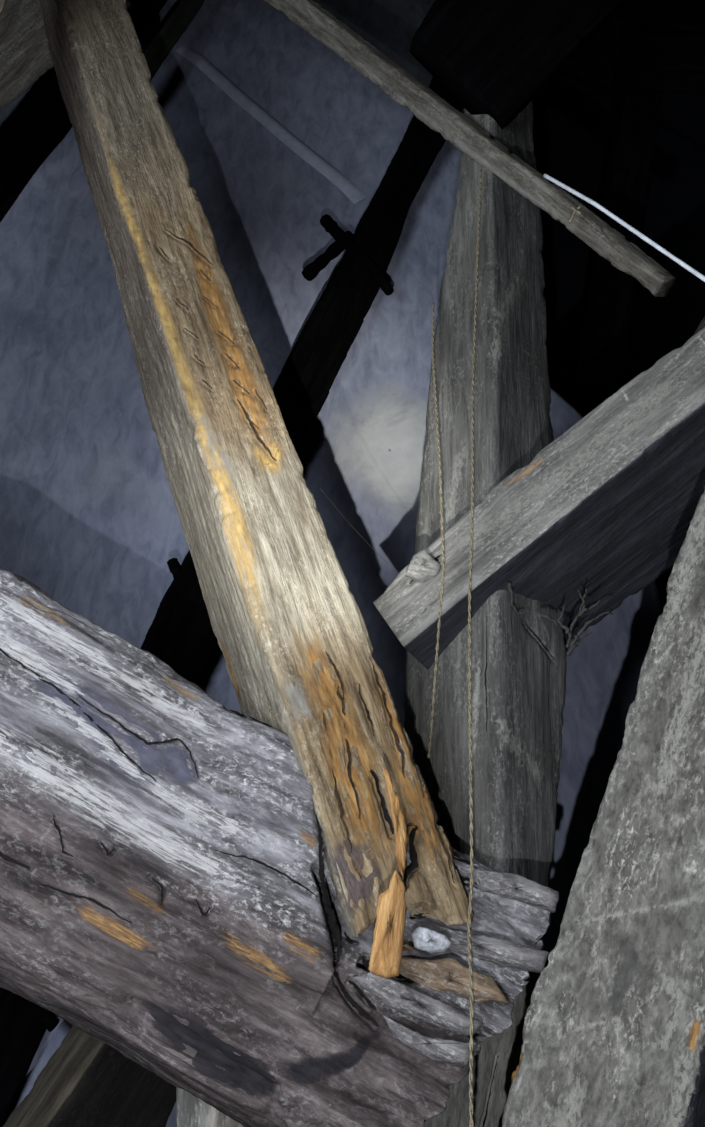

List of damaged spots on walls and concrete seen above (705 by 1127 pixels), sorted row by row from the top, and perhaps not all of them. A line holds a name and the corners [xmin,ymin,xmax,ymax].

crack [481,625,489,732]
crack [53,814,73,857]
crack [215,652,477,1027]
crack [0,852,131,923]
crack [152,878,164,905]
crack [196,899,210,916]